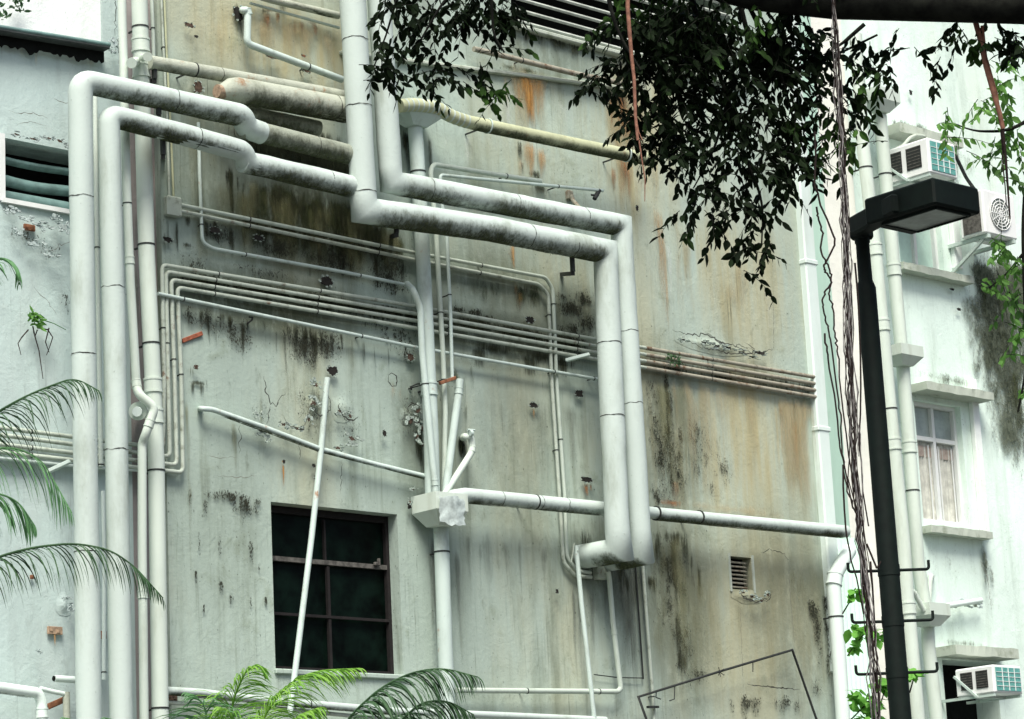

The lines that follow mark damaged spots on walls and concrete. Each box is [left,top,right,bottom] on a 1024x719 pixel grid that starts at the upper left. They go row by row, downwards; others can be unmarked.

peeling [3,205,70,258]
damp [93,91,621,372]
peeling [677,336,769,360]
damp [964,260,1024,460]
crack [264,380,310,459]
peeling [253,365,339,443]
peeling [333,409,365,452]
peeling [405,403,424,447]
damp [189,490,261,521]
damp [593,358,844,686]